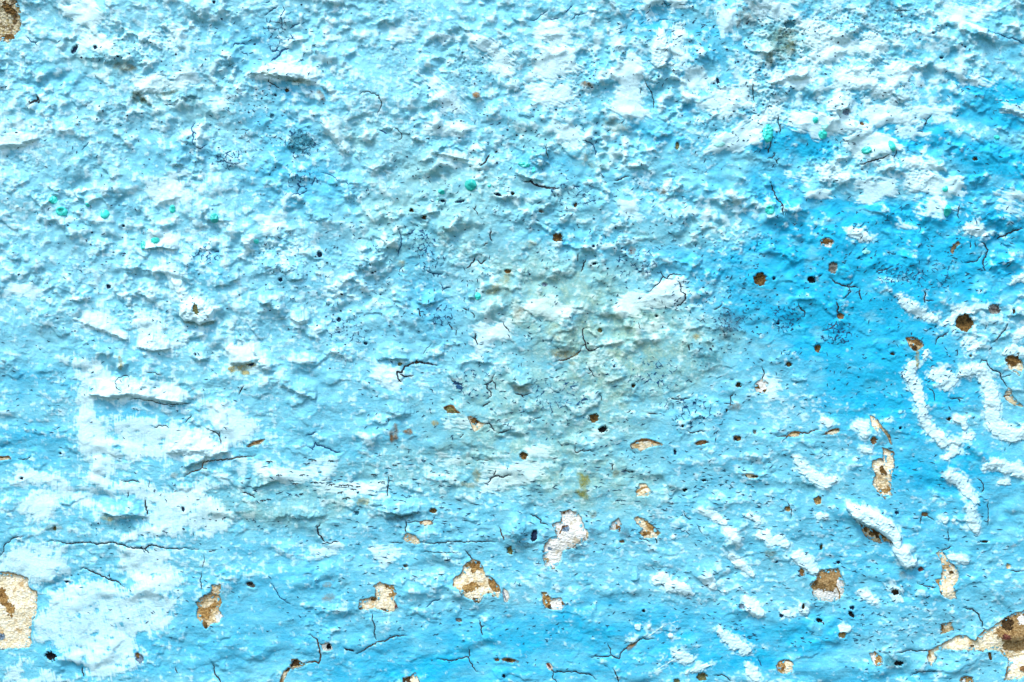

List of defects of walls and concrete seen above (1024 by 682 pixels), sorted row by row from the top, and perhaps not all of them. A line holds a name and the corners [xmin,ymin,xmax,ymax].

spalling [0,0,22,43]
crack [7,190,246,443]
spalling [870,416,895,499]
crack [46,427,253,597]
spalling [543,510,589,569]
spalling [0,572,38,650]
spalling [196,584,223,629]
spalling [358,582,398,612]
spalling [453,559,509,603]
spalling [799,568,846,603]
spalling [935,550,959,600]
spalling [927,610,1024,681]